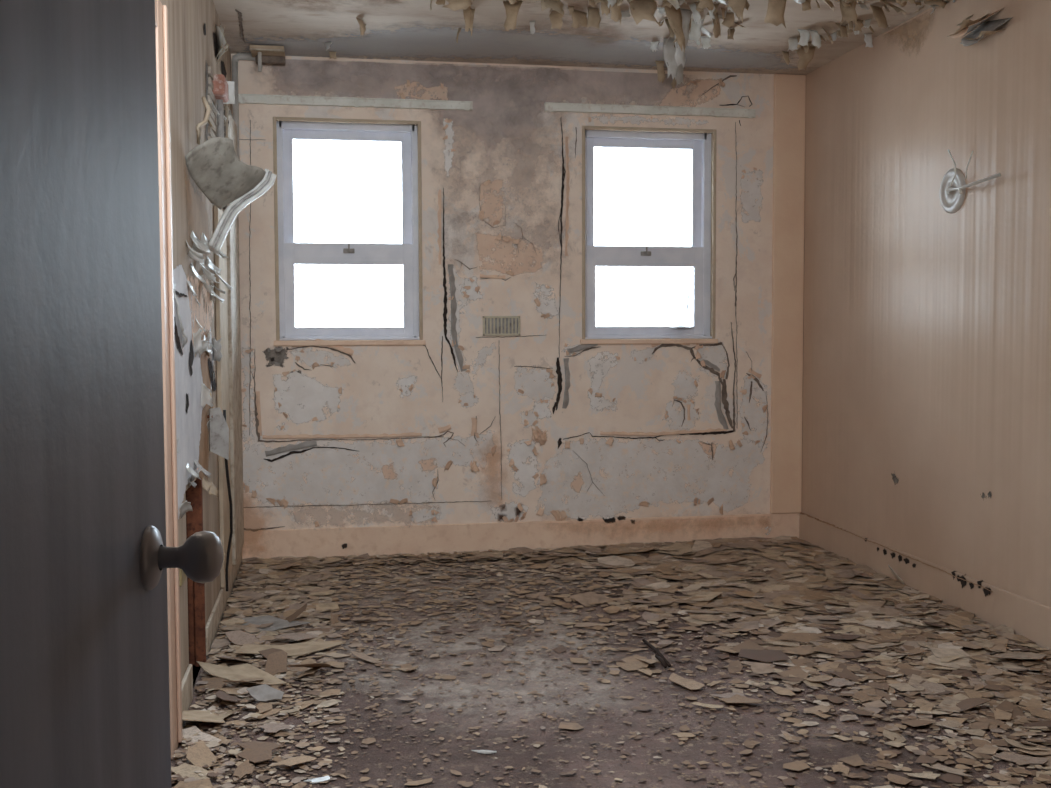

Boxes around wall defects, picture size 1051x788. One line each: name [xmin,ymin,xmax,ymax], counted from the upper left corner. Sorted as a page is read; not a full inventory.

peeling [430,0,475,43]
peeling [501,0,750,107]
peeling [764,0,956,70]
peeling [947,8,1013,46]
crack [239,120,262,165]
peeling [442,118,456,176]
peeling [173,103,277,519]
crack [249,123,601,506]
peeling [448,266,496,408]
crack [558,75,768,460]